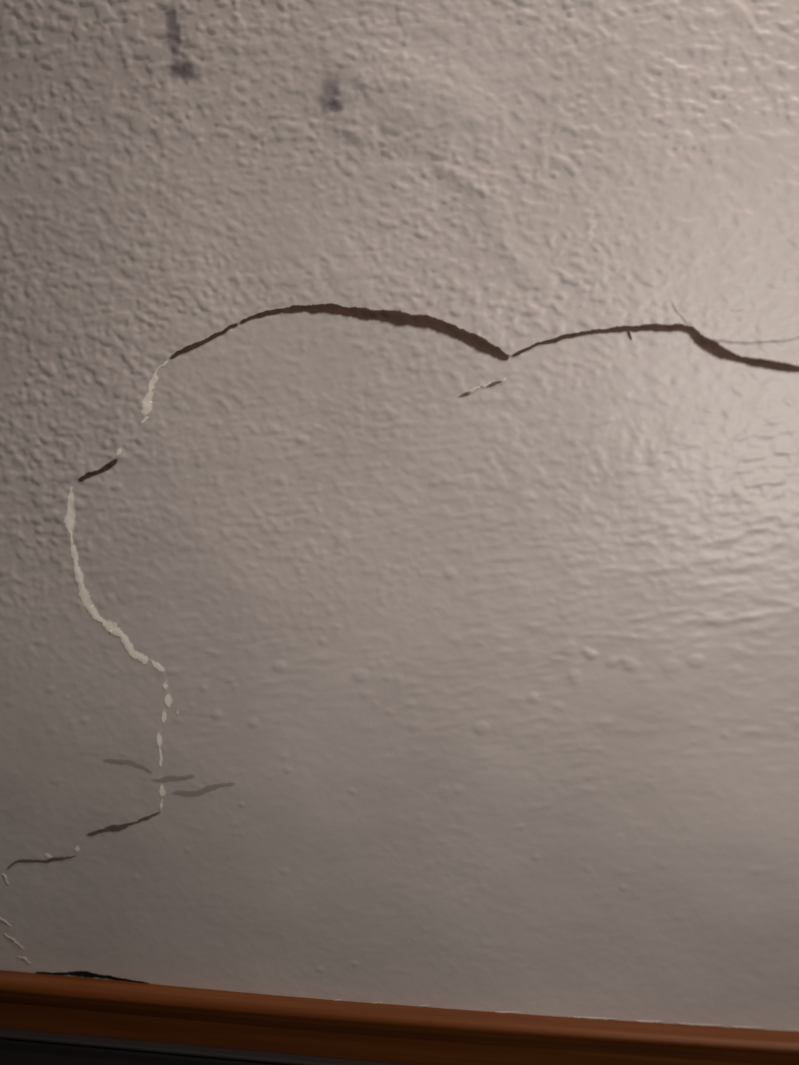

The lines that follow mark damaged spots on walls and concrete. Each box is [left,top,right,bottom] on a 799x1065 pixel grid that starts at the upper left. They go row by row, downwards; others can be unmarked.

crack [141,303,799,424]
crack [8,448,179,869]